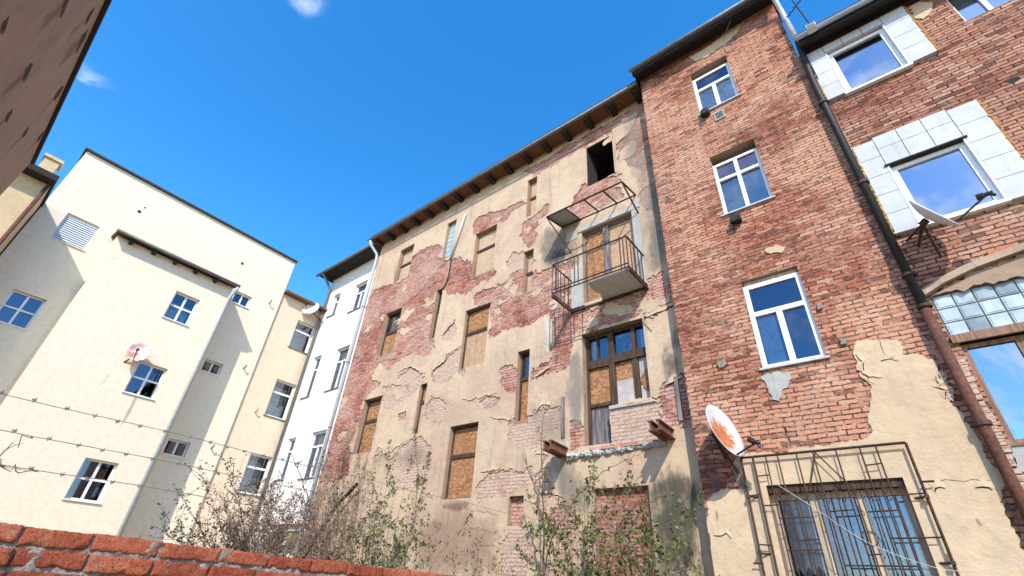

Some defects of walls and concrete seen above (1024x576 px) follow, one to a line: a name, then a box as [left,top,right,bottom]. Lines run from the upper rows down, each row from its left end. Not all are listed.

spalling [525,102,659,221]
spalling [320,201,674,492]
crack [855,342,898,384]